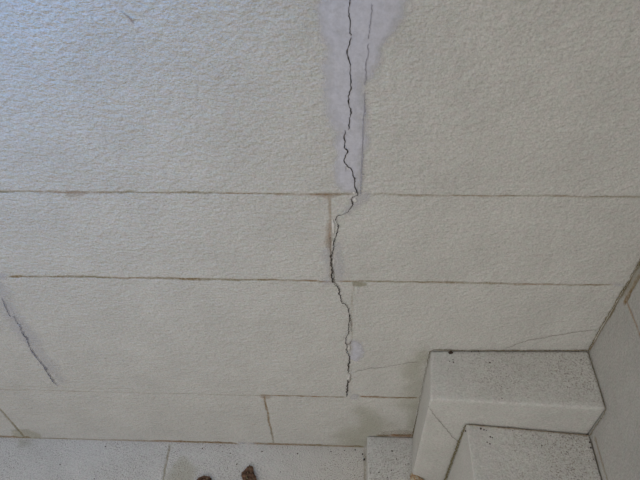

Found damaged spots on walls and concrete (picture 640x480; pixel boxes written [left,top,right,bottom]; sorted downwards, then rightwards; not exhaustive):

crack [3,301,57,385]
crack [330,2,415,396]